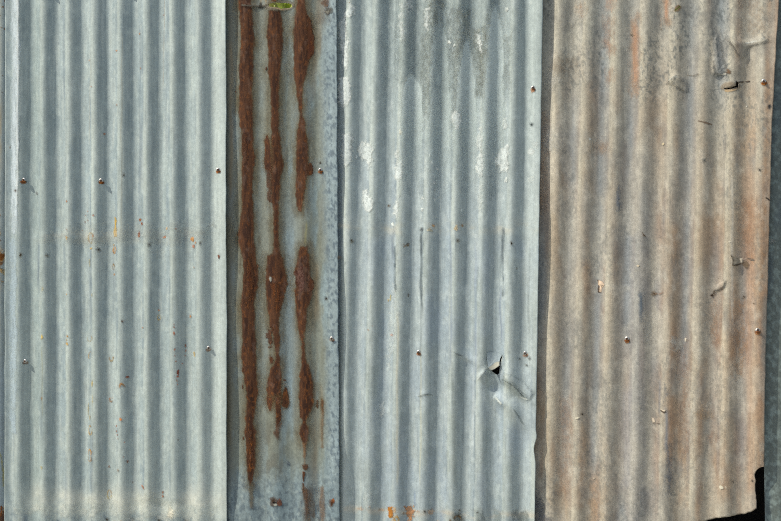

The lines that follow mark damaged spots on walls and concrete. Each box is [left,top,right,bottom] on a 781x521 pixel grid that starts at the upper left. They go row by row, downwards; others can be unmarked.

damp [394,151,403,182]
damp [399,6,509,182]
rust [235,0,335,521]
rust [388,505,414,521]